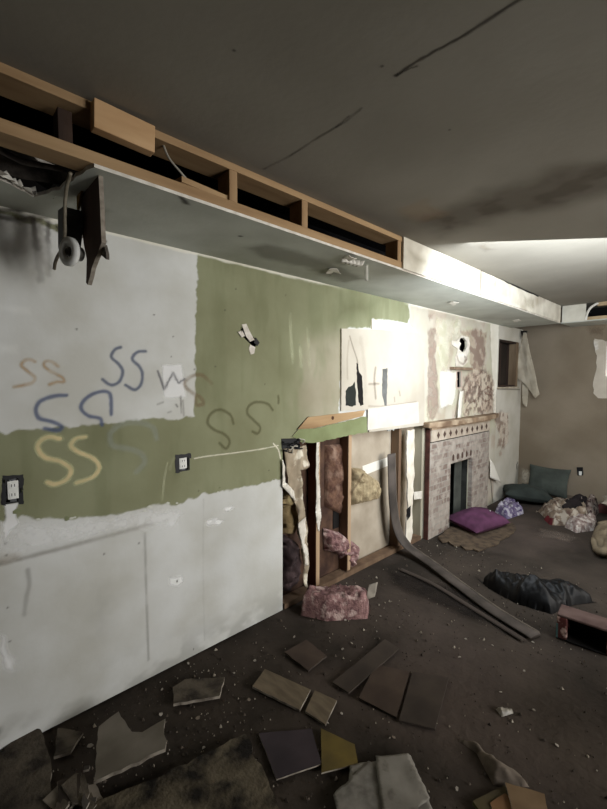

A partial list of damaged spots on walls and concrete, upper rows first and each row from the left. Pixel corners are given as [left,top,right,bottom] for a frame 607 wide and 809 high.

crack [395,0,520,76]
damp [0,209,38,249]
flaking render [428,329,438,418]
flaking render [450,329,494,415]
flaking render [593,339,607,398]
spalling [1,474,24,514]